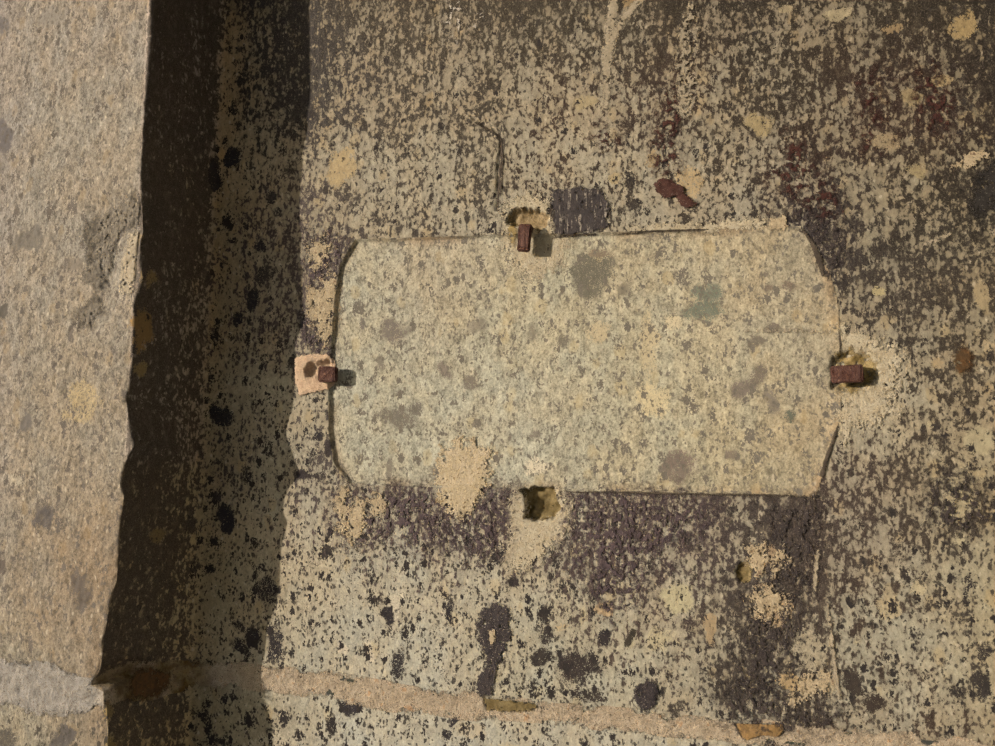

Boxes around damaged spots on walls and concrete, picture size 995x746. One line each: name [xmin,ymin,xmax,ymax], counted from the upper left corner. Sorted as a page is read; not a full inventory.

rust [834,347,879,394]
damp [325,478,519,559]
spalling [431,433,498,523]
spalling [498,481,578,573]
damp [557,479,722,625]